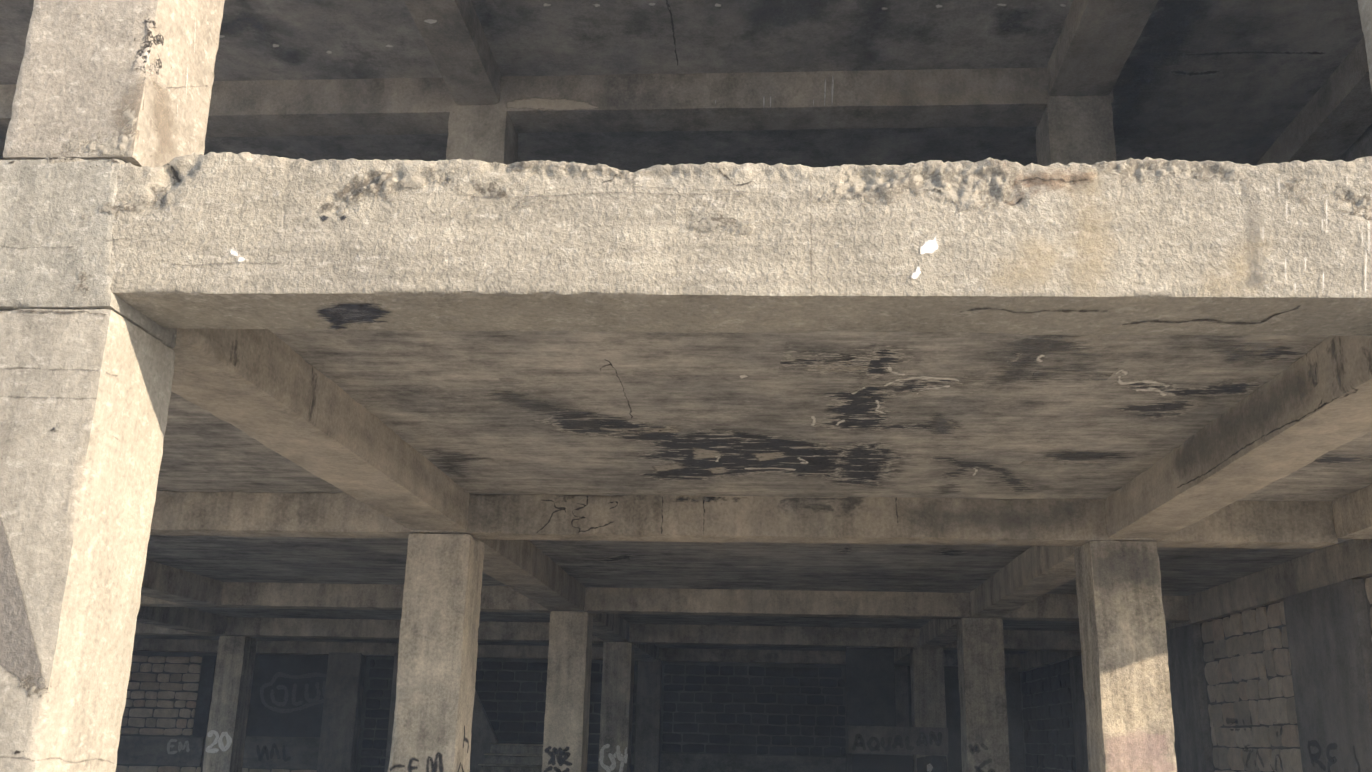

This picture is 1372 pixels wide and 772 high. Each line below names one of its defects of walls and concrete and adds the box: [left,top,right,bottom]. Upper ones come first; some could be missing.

crack [960,306,1300,325]
water stain [484,342,1128,510]
water stain [989,336,1359,472]
crack [537,496,618,533]